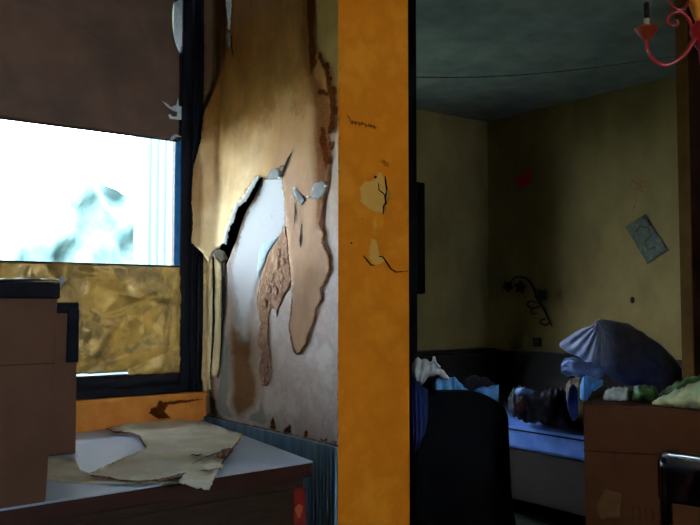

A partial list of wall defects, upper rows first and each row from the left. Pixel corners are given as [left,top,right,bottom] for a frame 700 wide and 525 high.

spalling [201,177,297,392]
peeling [359,172,391,265]
crack [363,255,407,273]